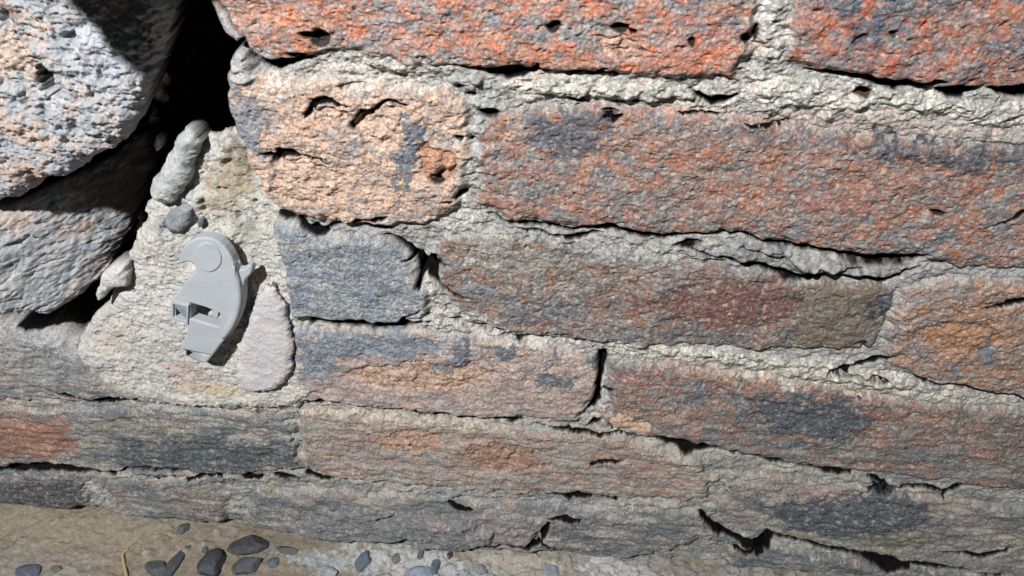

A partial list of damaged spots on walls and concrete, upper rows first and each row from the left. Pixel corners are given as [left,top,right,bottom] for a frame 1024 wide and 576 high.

crack [304,81,408,129]
crack [279,208,970,500]
crack [447,500,473,511]
crack [481,491,618,550]